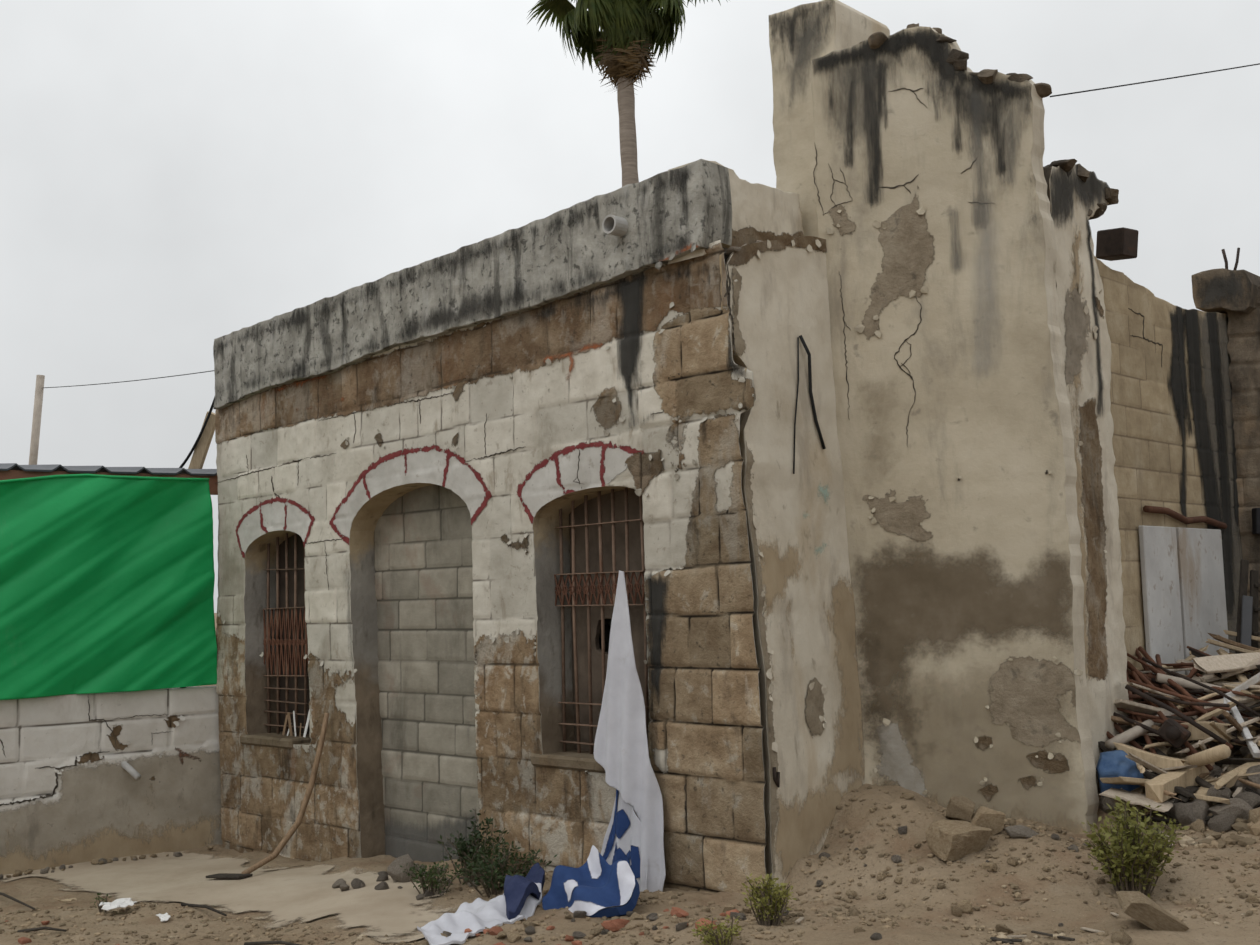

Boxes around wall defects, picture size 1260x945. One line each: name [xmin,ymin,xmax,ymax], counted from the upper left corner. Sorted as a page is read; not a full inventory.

water stain [771,6,1025,204]
water stain [273,309,306,330]
water stain [402,282,533,337]
water stain [552,271,644,420]
spalling [854,186,935,339]
crack [894,296,922,439]
spalling [1064,281,1105,384]
flaking render [215,205,856,898]
water stain [771,427,1090,879]
spalling [973,398,1108,790]
crack [0,697,170,806]
flaking render [0,611,361,862]